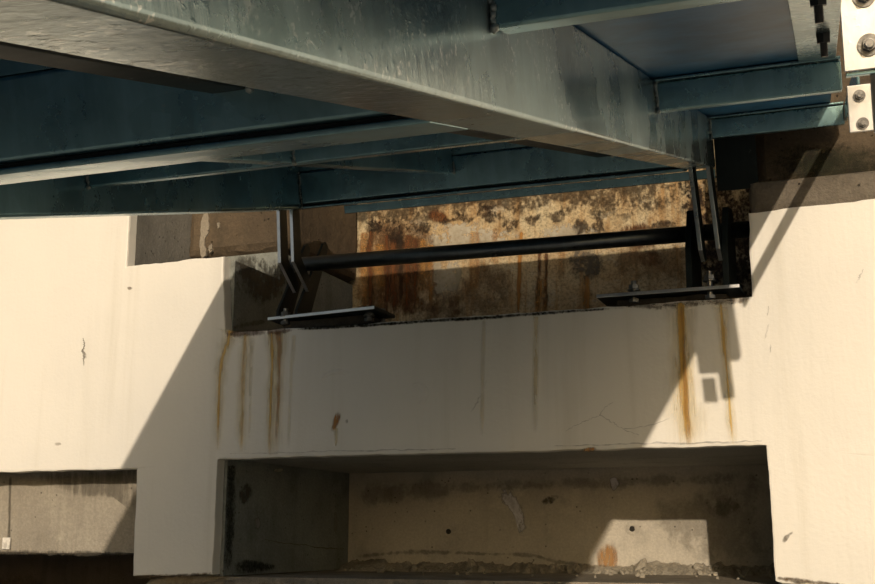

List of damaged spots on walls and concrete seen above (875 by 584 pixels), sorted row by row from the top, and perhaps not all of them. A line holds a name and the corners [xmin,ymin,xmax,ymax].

rust [362,221,433,252]
rust [358,262,459,321]
rust [536,253,548,311]
rust [217,329,286,426]
rust [678,303,688,428]
spalling [335,558,775,580]
rust [598,546,615,567]